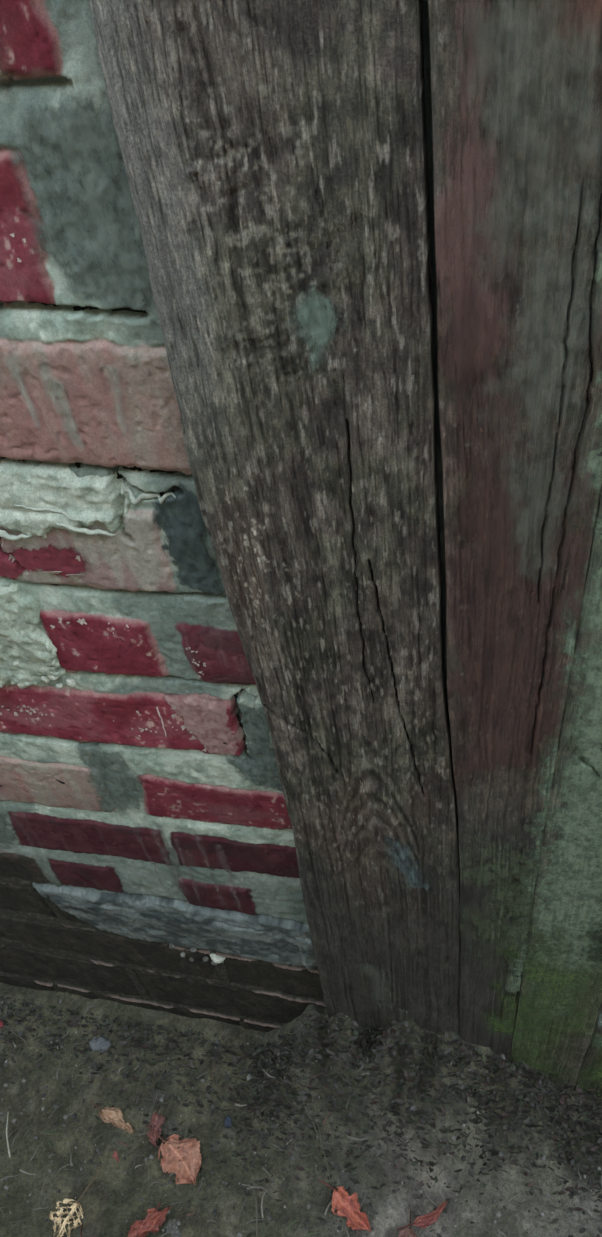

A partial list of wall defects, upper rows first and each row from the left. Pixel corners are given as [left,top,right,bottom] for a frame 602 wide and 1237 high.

peeling [0,538,86,579]